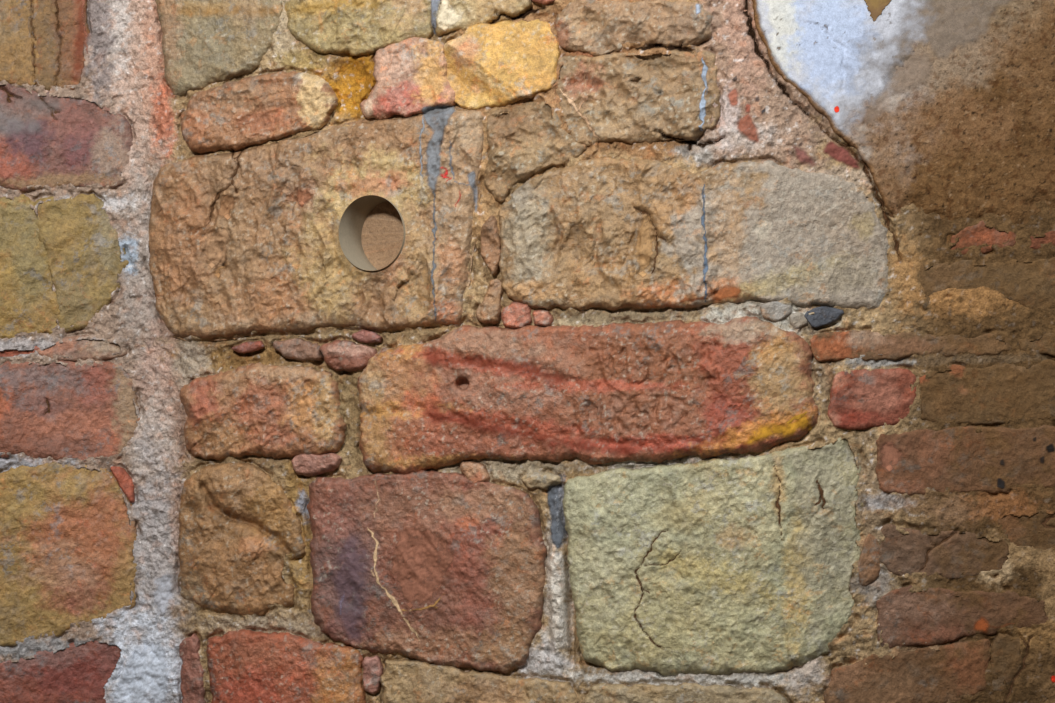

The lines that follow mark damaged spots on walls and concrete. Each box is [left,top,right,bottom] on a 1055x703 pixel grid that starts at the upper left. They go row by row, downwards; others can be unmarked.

peeling [757,0,921,129]
crack [634,530,681,648]